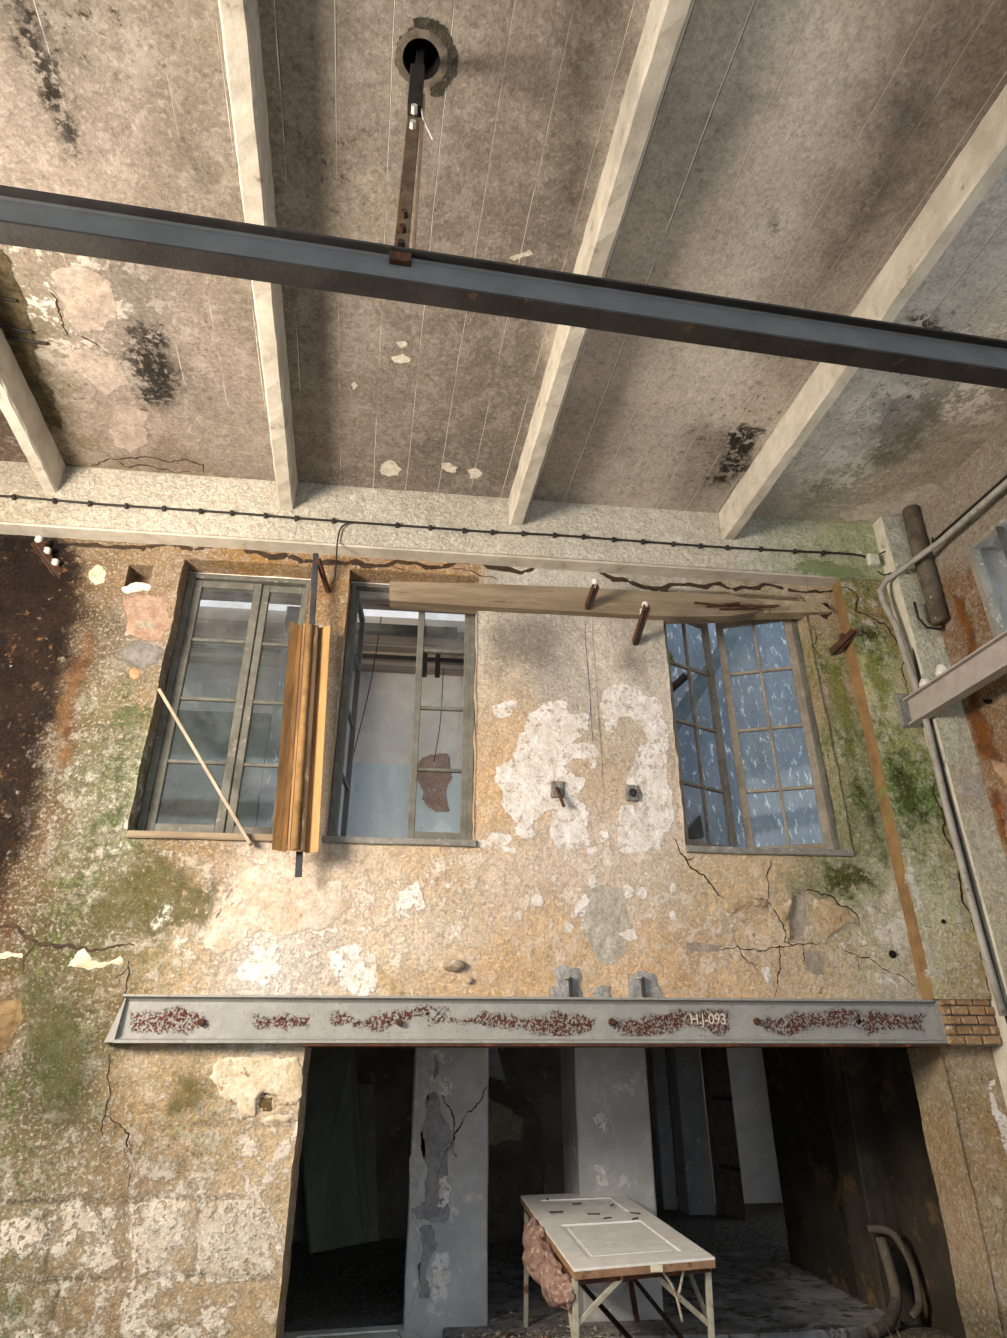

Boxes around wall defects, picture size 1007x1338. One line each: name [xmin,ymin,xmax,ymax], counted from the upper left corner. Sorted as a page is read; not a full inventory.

damp [15,0,77,156]
damp [127,326,177,405]
crack [43,538,535,579]
crack [598,572,909,694]
damp [0,534,90,892]
peeling [477,683,676,856]
peeling [564,874,647,965]
crack [718,859,913,993]
rust [130,1006,207,1035]
rust [252,1013,310,1029]
rust [331,1004,730,1036]
spalling [406,1048,457,1319]